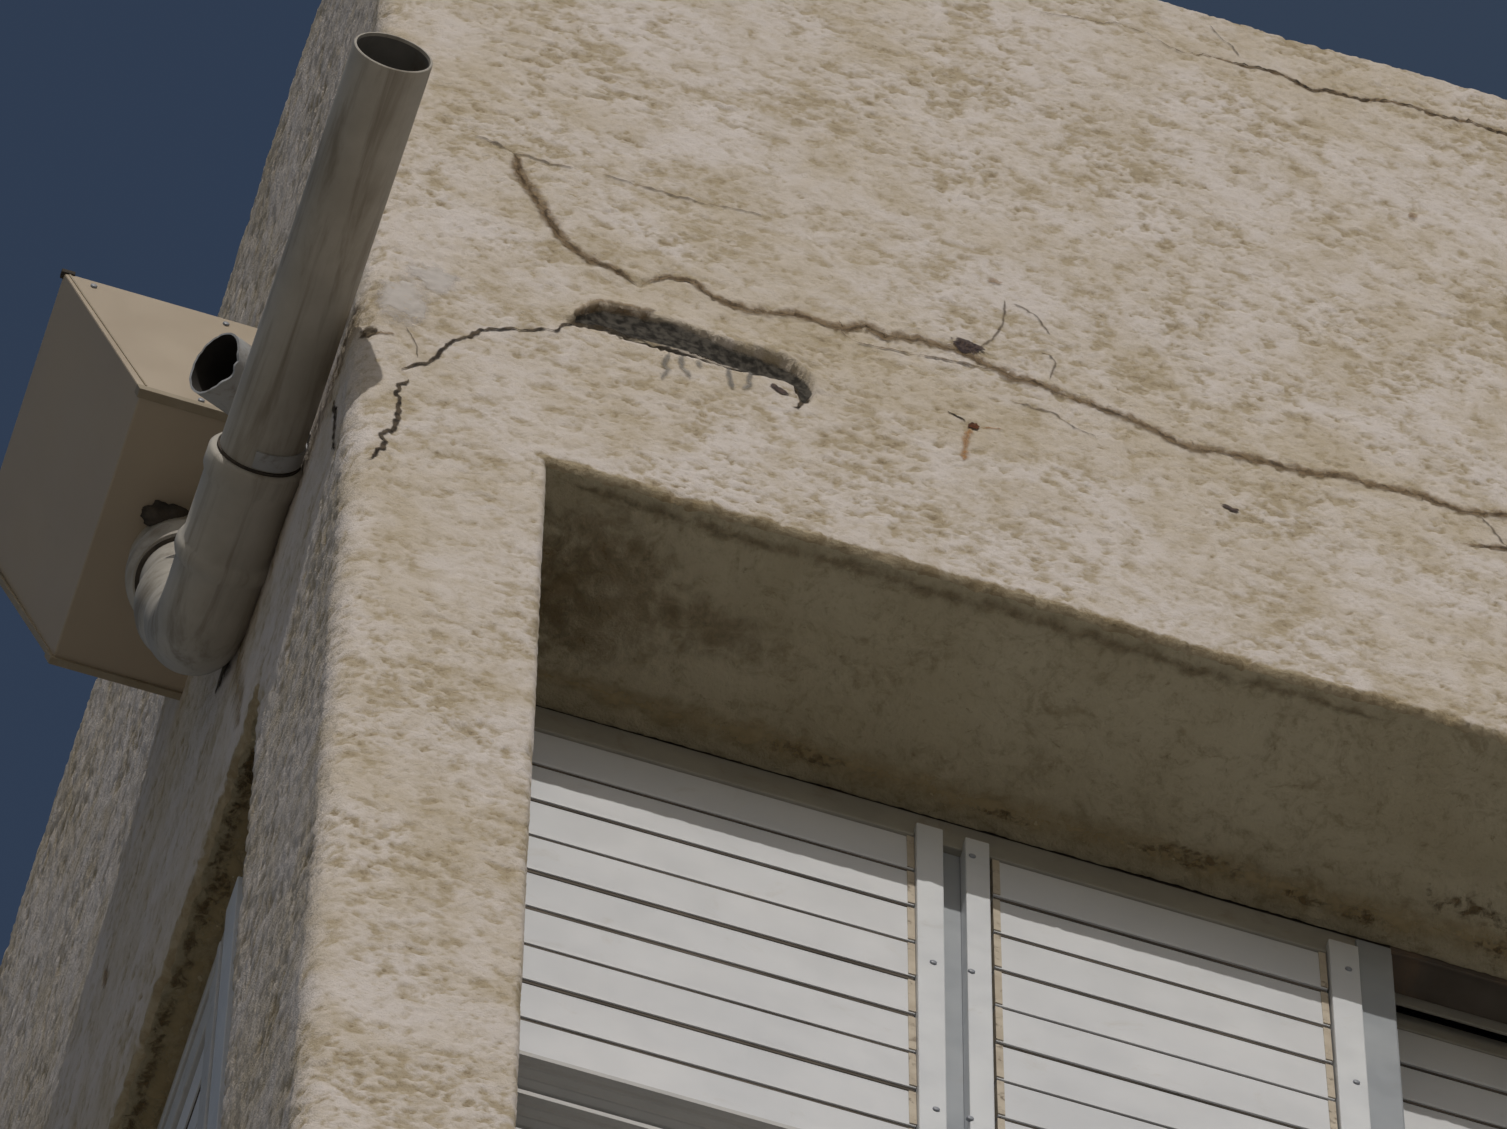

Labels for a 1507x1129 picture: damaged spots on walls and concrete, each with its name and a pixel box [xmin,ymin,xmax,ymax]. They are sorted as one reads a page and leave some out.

crack [1049,13,1507,136]
crack [331,323,574,459]
flaking render [574,299,812,408]
crack [480,136,1507,551]
water stain [127,749,255,1129]